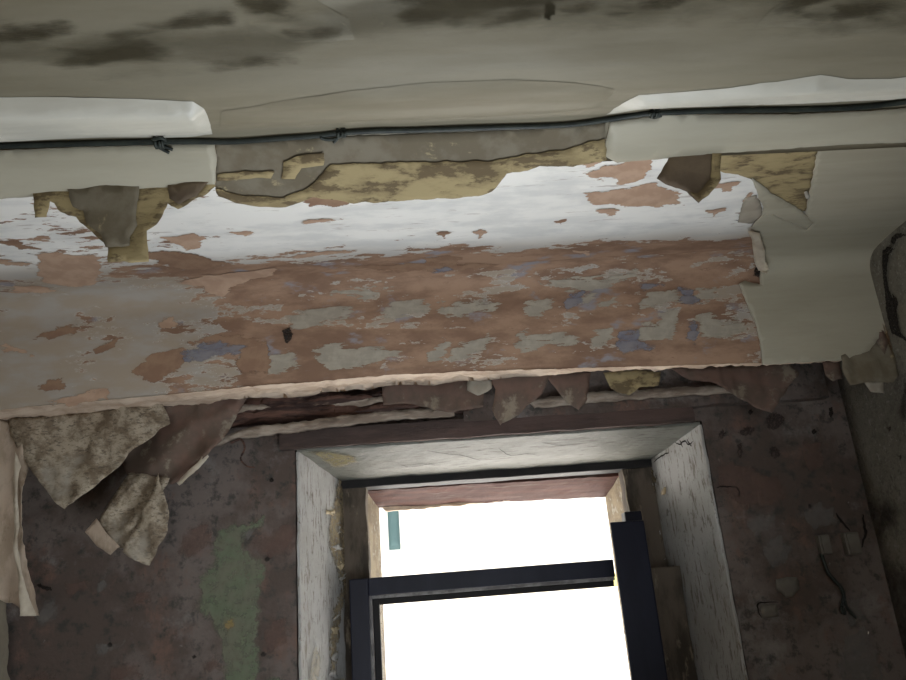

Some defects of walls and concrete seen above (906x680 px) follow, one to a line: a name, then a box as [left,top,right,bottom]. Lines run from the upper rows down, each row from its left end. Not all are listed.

damp [0,25,67,41]
damp [64,36,162,66]
damp [169,15,231,29]
damp [240,0,285,14]
damp [400,0,588,23]
peeling [304,197,349,207]
peeling [583,160,682,216]
peeling [0,240,104,294]
peeling [148,233,277,298]
peeling [514,268,748,354]
crack [882,233,906,341]
spalling [0,284,839,422]